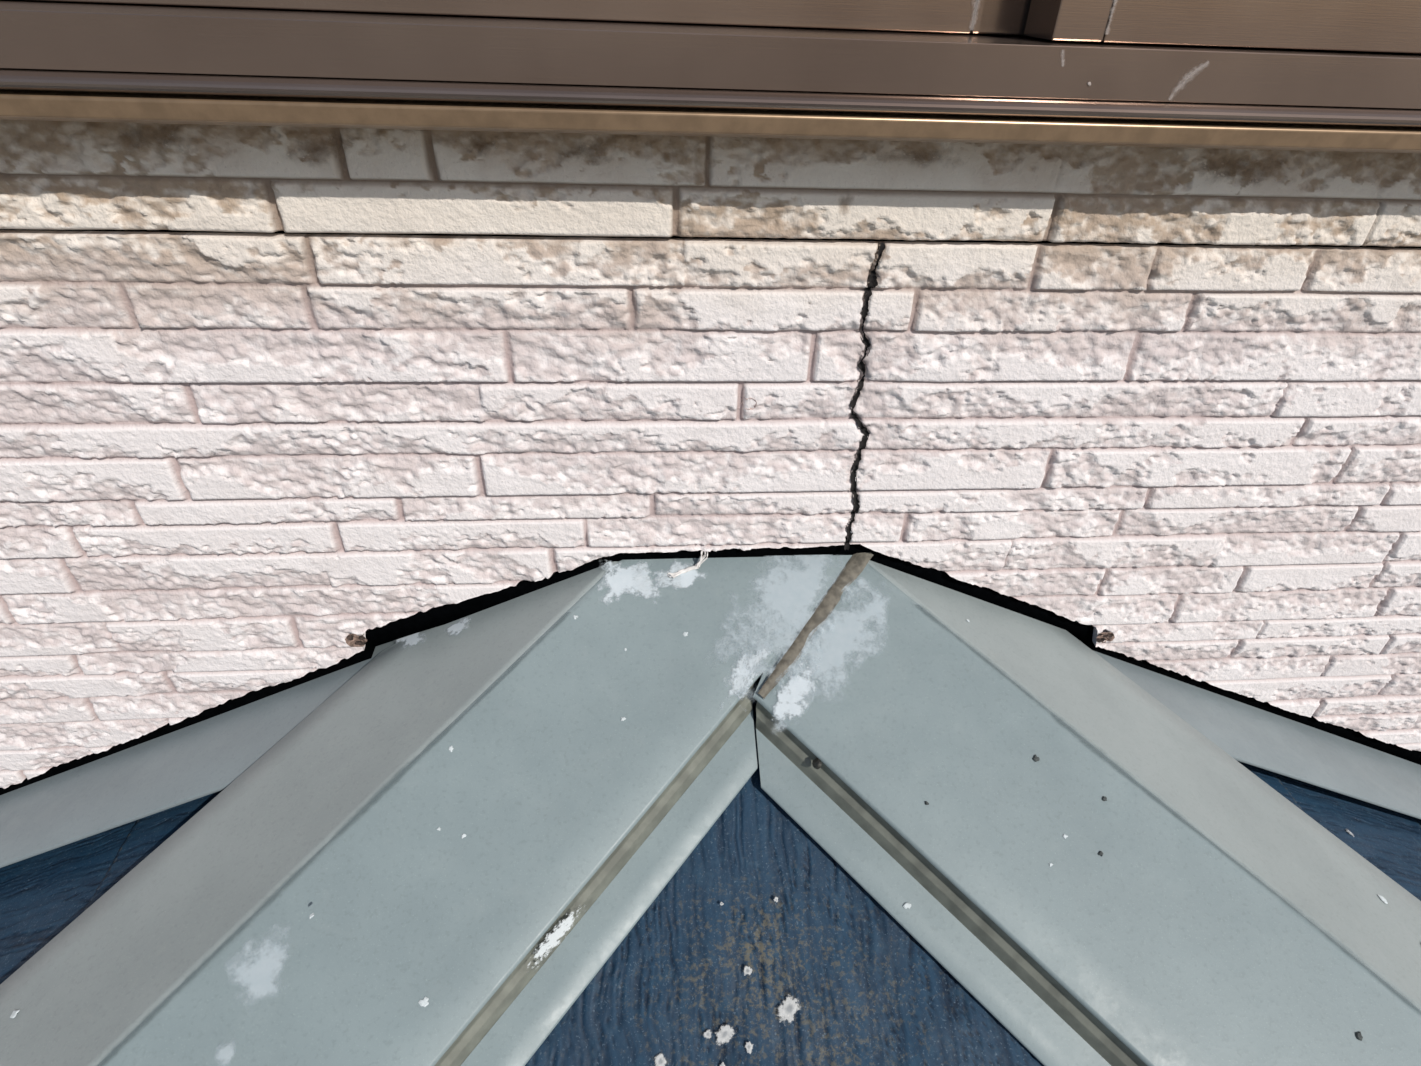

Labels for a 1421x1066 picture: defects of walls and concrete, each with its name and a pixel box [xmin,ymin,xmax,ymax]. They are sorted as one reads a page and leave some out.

crack [844,243,886,550]